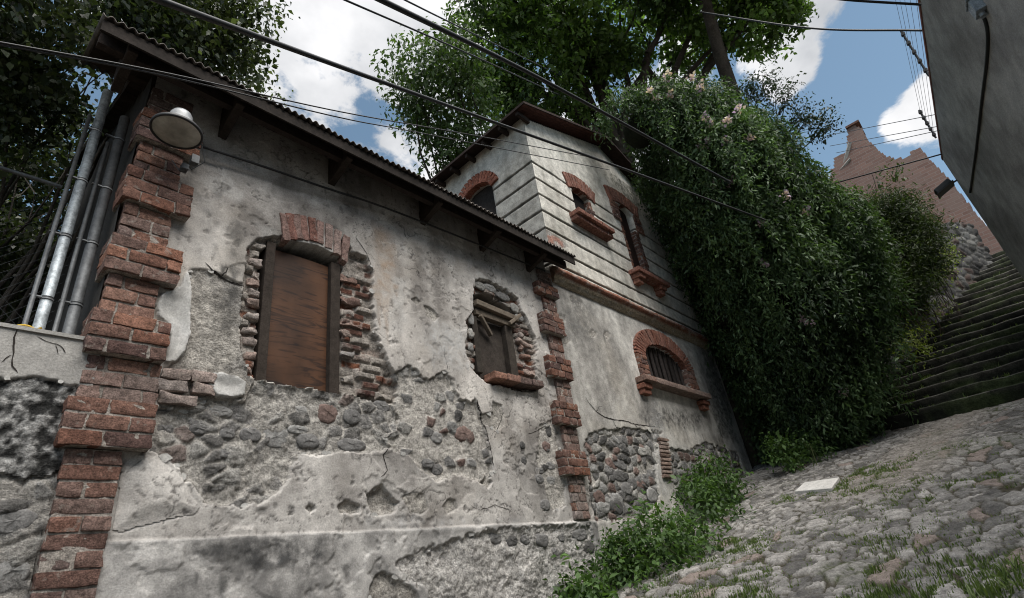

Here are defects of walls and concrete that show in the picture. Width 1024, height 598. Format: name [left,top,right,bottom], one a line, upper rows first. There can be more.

flaking render [150,238,503,508]
spalling [338,487,395,516]